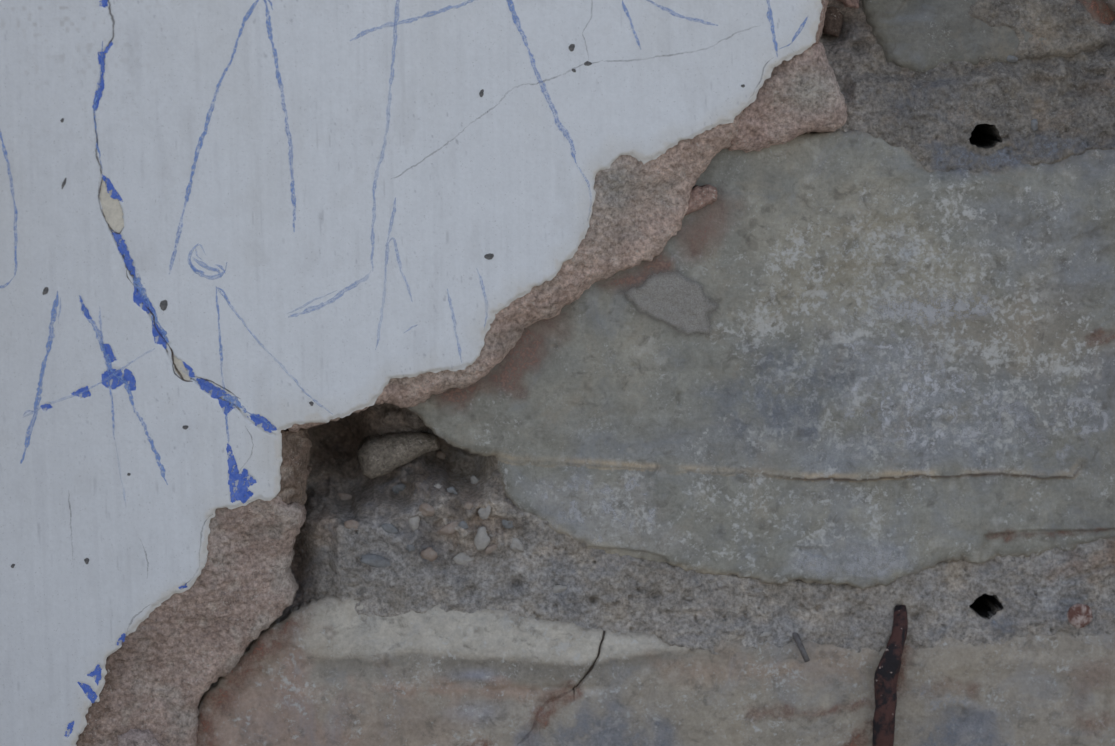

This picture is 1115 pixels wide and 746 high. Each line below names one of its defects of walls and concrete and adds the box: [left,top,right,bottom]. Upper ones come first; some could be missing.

crack [92,0,277,433]
spalling [64,110,743,746]
spalling [807,0,829,50]
crack [573,631,605,698]